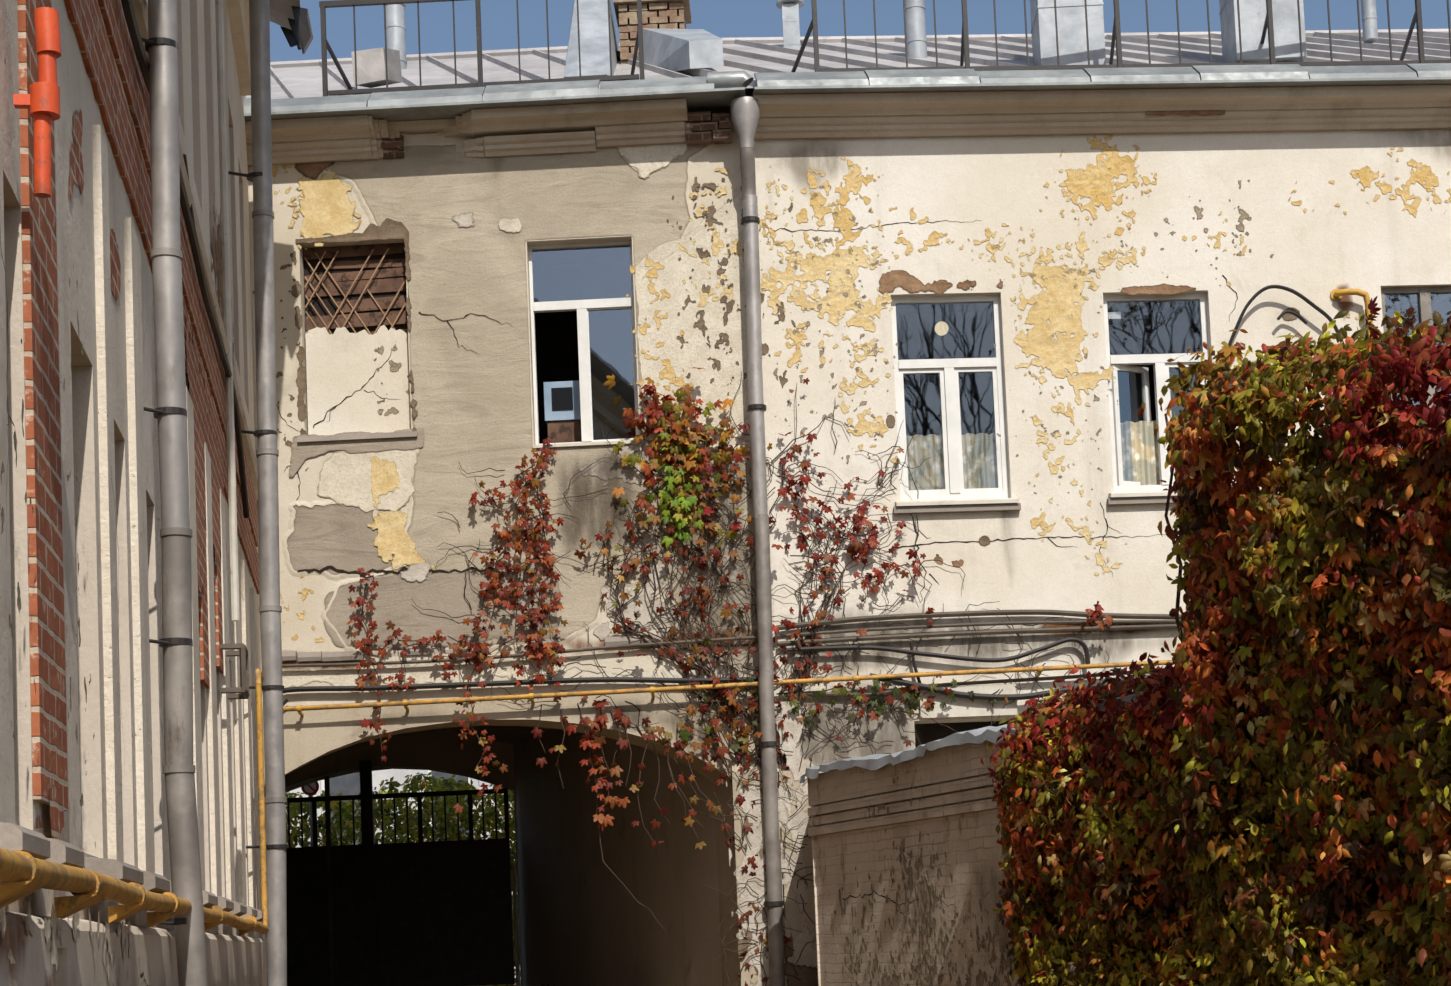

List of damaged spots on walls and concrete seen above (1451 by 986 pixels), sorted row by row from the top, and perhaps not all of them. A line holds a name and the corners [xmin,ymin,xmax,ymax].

flaking render [69,108,84,202]
peeling [1329,146,1451,217]
flaking render [110,229,121,301]
crack [418,311,512,354]
crack [277,341,396,431]
flaking render [272,133,1252,692]
crack [297,566,508,580]
crack [892,503,1166,600]
flaking render [68,674,98,744]
peeling [678,693,1028,986]